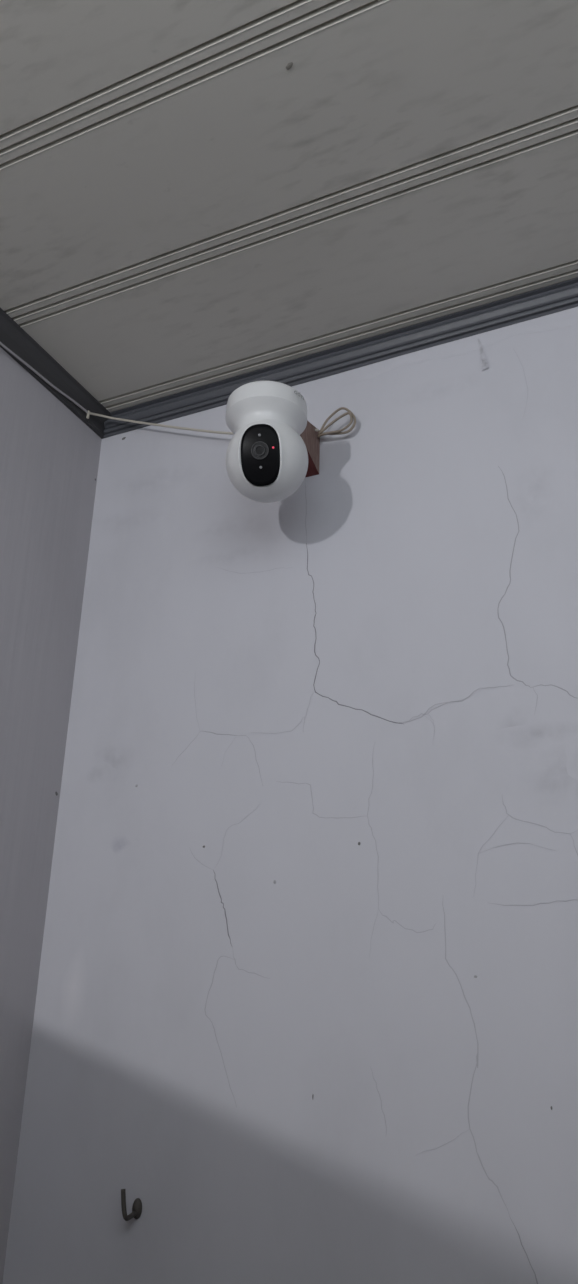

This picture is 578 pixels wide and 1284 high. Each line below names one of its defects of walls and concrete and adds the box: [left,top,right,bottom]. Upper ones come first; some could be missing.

crack [174,466,578,1284]